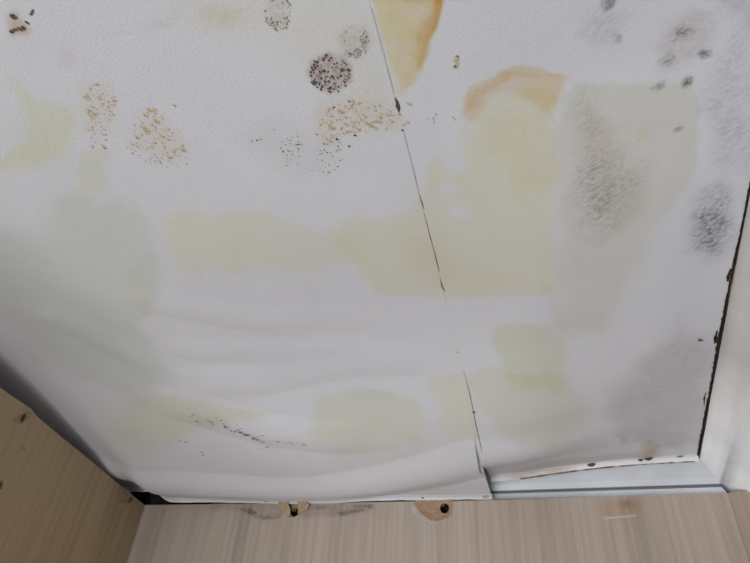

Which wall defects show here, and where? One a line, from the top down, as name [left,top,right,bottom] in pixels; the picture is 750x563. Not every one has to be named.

water stain [9,9,34,33]
water stain [310,31,369,93]
corrosion [83,83,116,149]
corrosion [125,108,187,168]
corrosion [316,100,395,142]
water stain [372,10,424,209]
peeling [490,454,699,482]